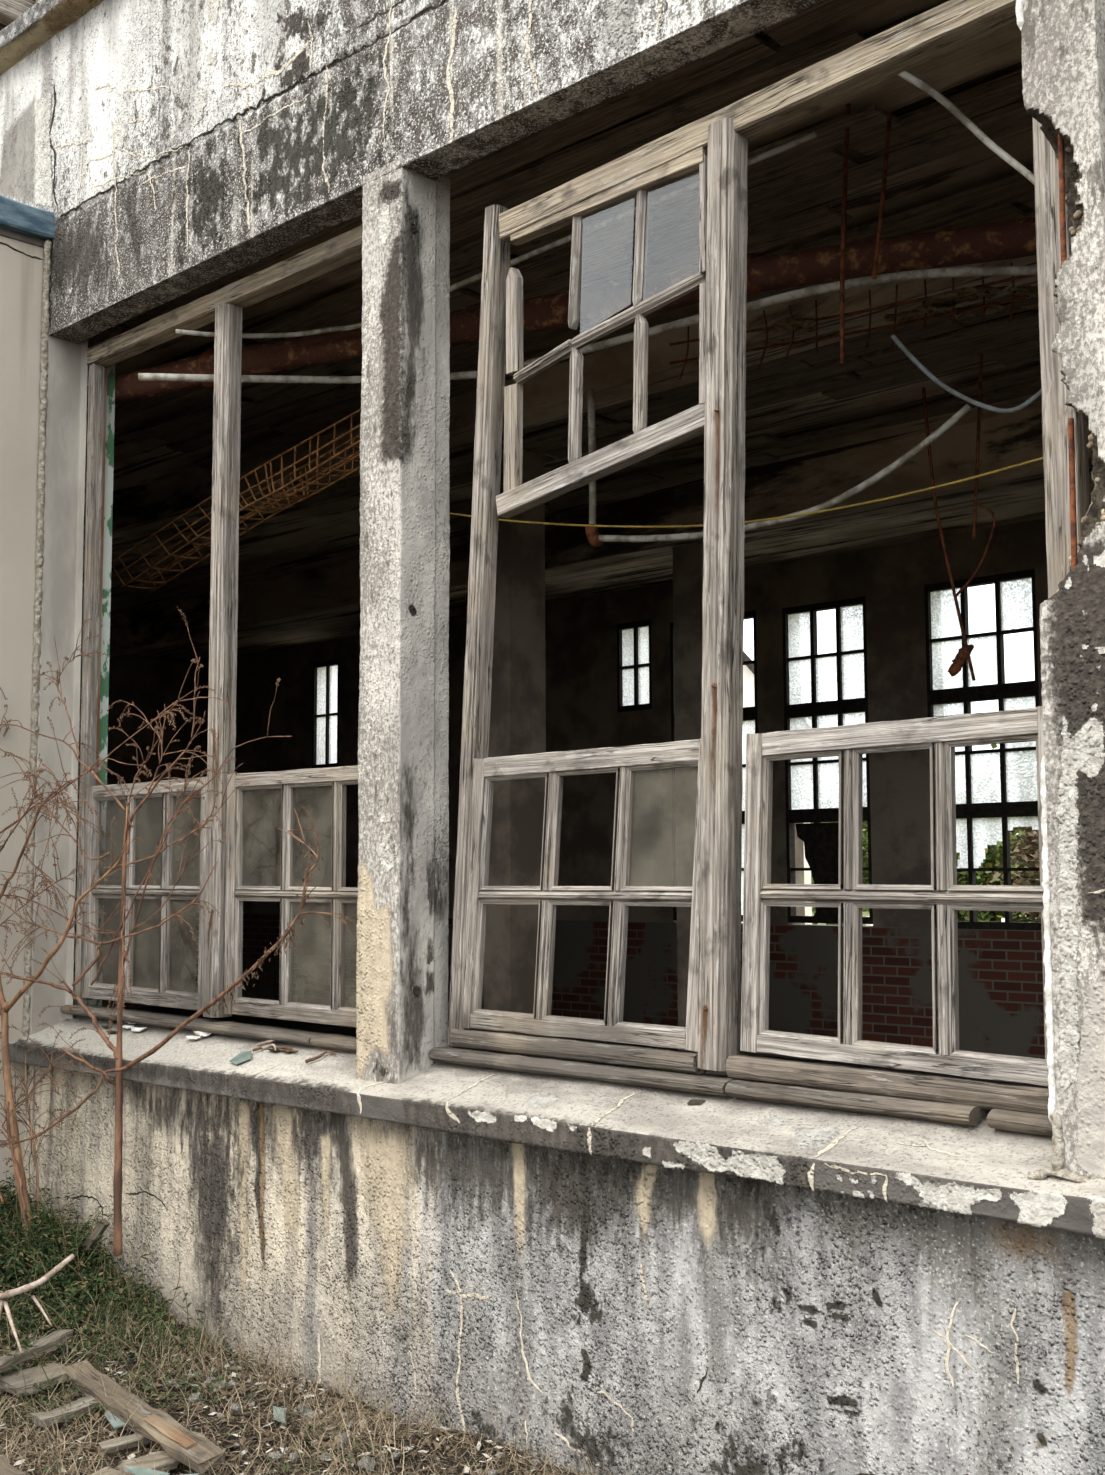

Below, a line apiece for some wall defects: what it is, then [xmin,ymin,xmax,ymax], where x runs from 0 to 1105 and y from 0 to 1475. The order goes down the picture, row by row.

crack [49,0,457,283]
leakage [379,179,424,461]
crack [525,0,539,91]
crack [655,0,663,31]
spalling [1027,107,1084,304]
spalling [1047,371,1105,600]
leakage [372,769,447,1076]
peeling [1056,703,1105,1097]
leakage [14,1040,837,1329]
peeling [642,1141,786,1185]
peeling [836,1172,1067,1228]
leakage [544,1397,634,1473]